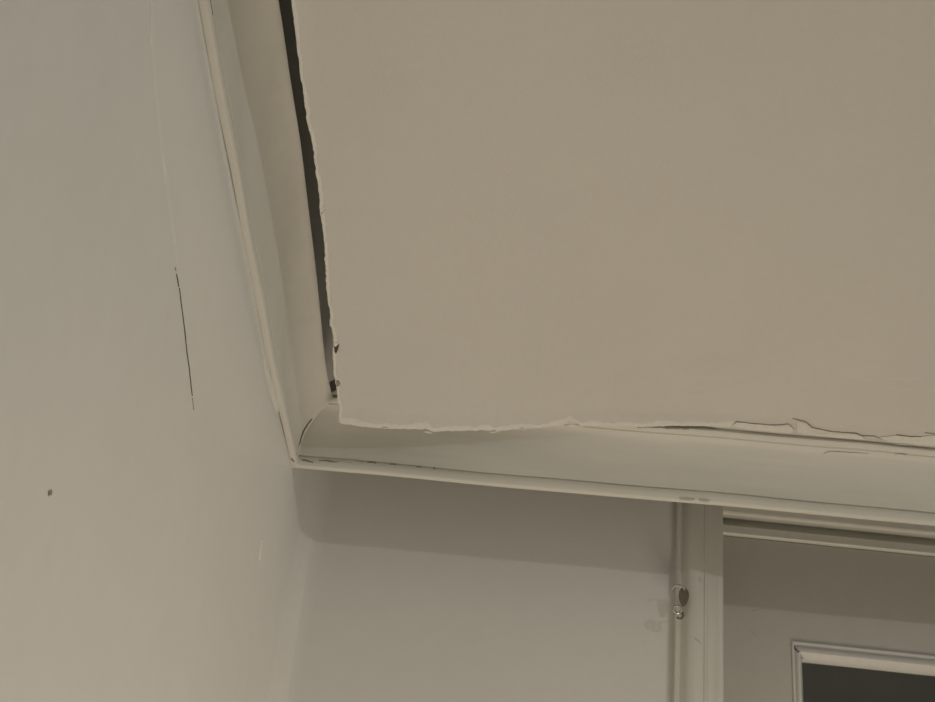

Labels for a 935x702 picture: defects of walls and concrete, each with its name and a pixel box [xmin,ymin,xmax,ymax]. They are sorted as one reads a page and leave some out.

crack [175,267,194,410]
peeling [731,418,935,446]